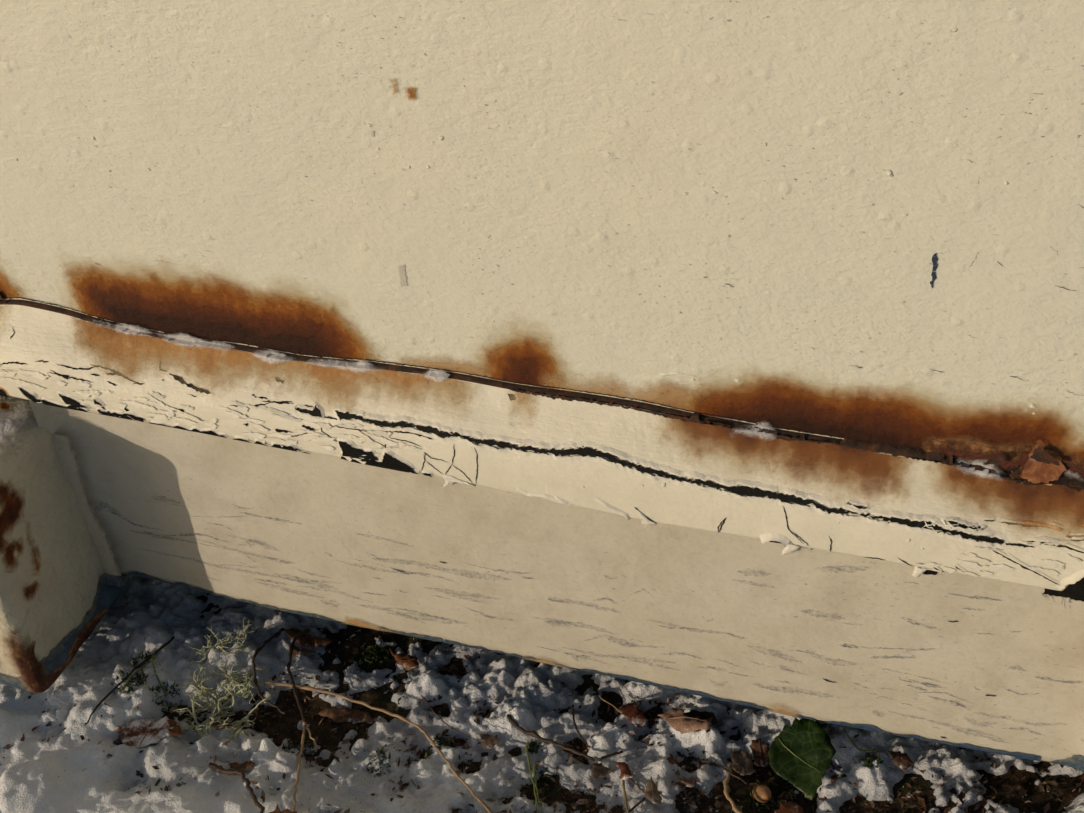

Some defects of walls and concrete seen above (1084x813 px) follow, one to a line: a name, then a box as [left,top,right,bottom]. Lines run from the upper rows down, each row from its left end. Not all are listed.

corrosion [0,273,20,303]
crack [2,327,167,386]
peeling [0,365,476,488]
corrosion [69,269,1084,527]
corrosion [0,482,40,599]
crack [229,401,1084,585]
peeling [912,528,1084,602]